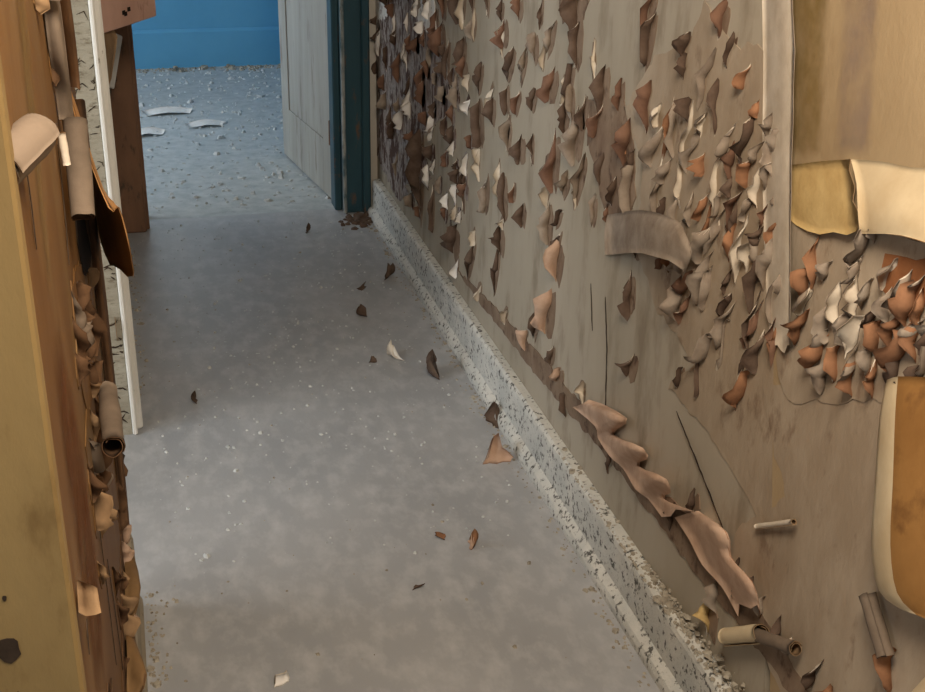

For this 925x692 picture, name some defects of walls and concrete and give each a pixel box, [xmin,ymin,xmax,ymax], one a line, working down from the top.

peeling [35,0,50,15]
spalling [71,219,141,641]
peeling [369,0,925,692]